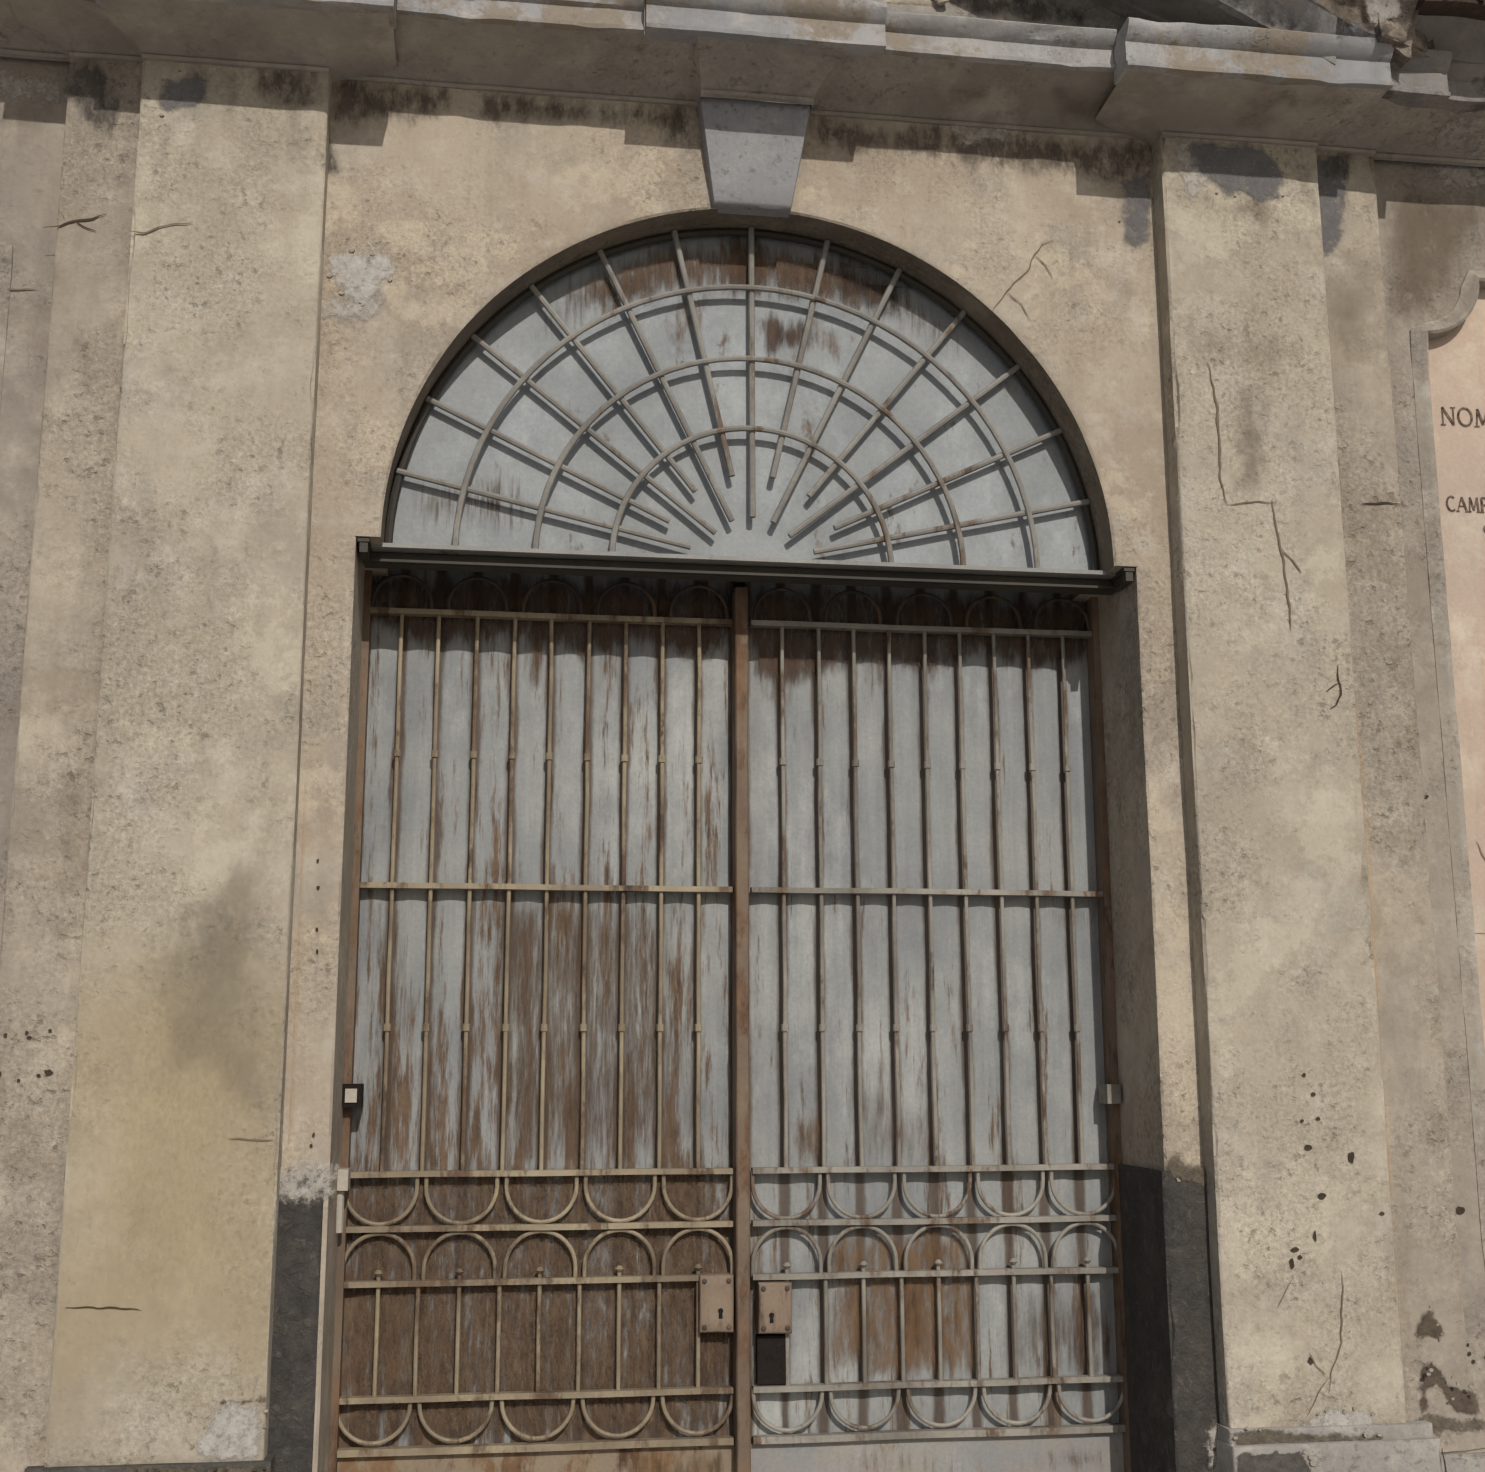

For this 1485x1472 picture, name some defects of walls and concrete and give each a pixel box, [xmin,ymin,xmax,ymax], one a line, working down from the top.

water stain [64,63,119,128]
water stain [485,97,584,119]
water stain [818,119,1152,179]
water stain [1175,137,1209,198]
crack [993,240,1053,321]
crack [1207,362,1302,627]
spalling [123,1397,268,1472]